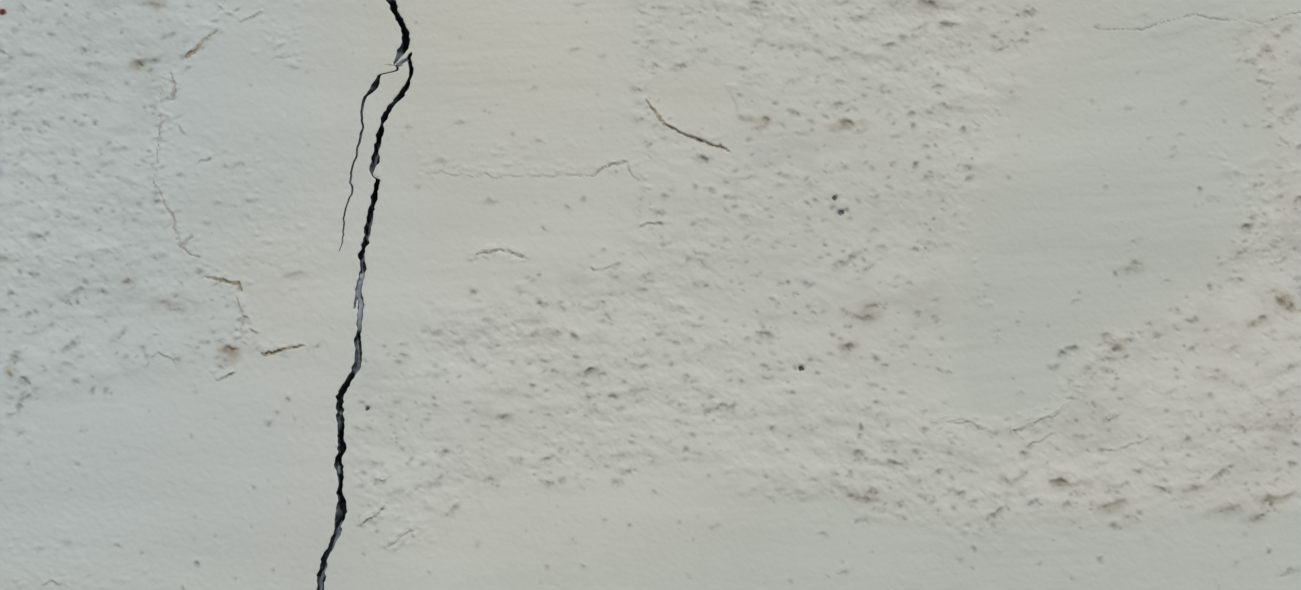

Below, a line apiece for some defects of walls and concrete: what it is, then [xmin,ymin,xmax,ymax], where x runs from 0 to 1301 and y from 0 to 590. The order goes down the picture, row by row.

crack [316,0,414,590]